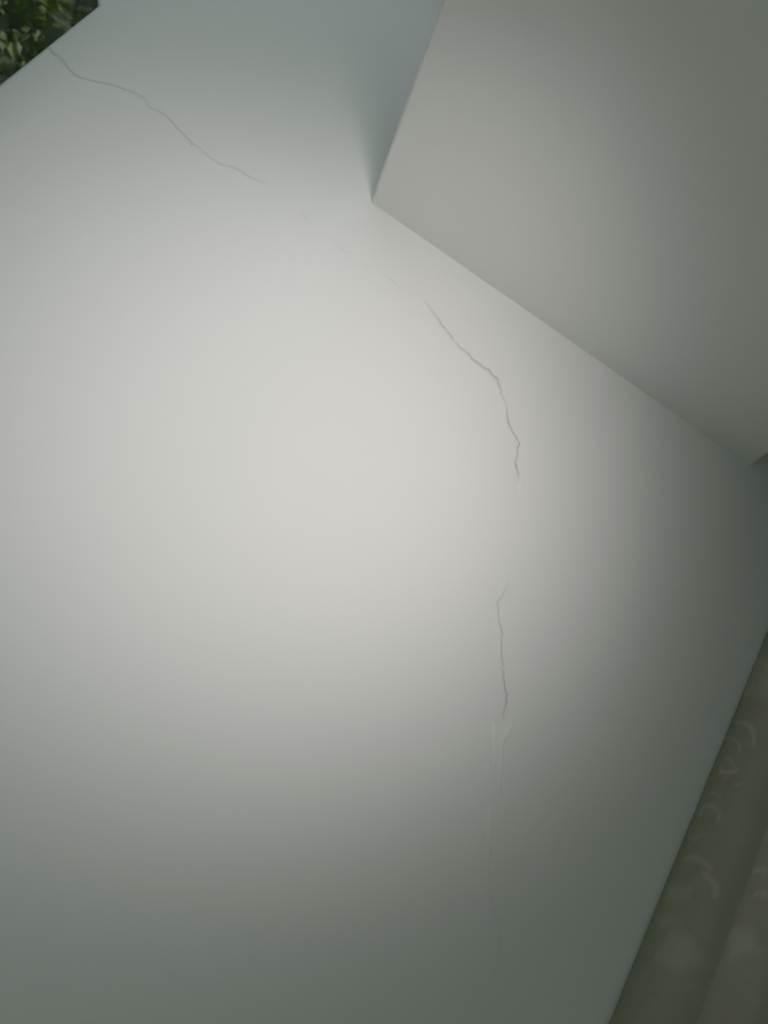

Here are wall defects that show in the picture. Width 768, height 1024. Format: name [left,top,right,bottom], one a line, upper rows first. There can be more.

crack [425,302,521,481]
crack [495,578,511,722]